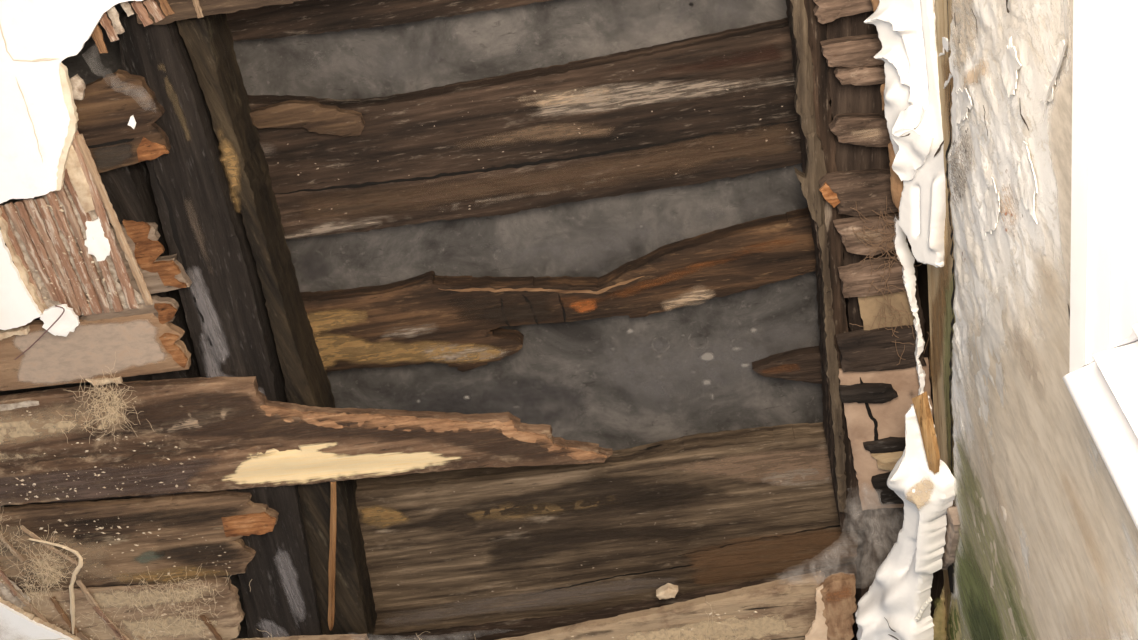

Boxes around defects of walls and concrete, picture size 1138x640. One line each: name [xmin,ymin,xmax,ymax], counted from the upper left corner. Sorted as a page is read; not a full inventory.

crack [0,24,56,163]
spalling [55,62,79,191]
peeling [537,81,741,116]
peeling [1039,0,1073,318]
spalling [0,326,30,340]
spalling [0,208,47,313]
flaking render [915,259,931,359]
peeling [0,400,39,411]
peeling [222,443,461,484]
damp [947,261,1138,640]
peeling [805,584,828,640]
flaking render [933,586,947,640]